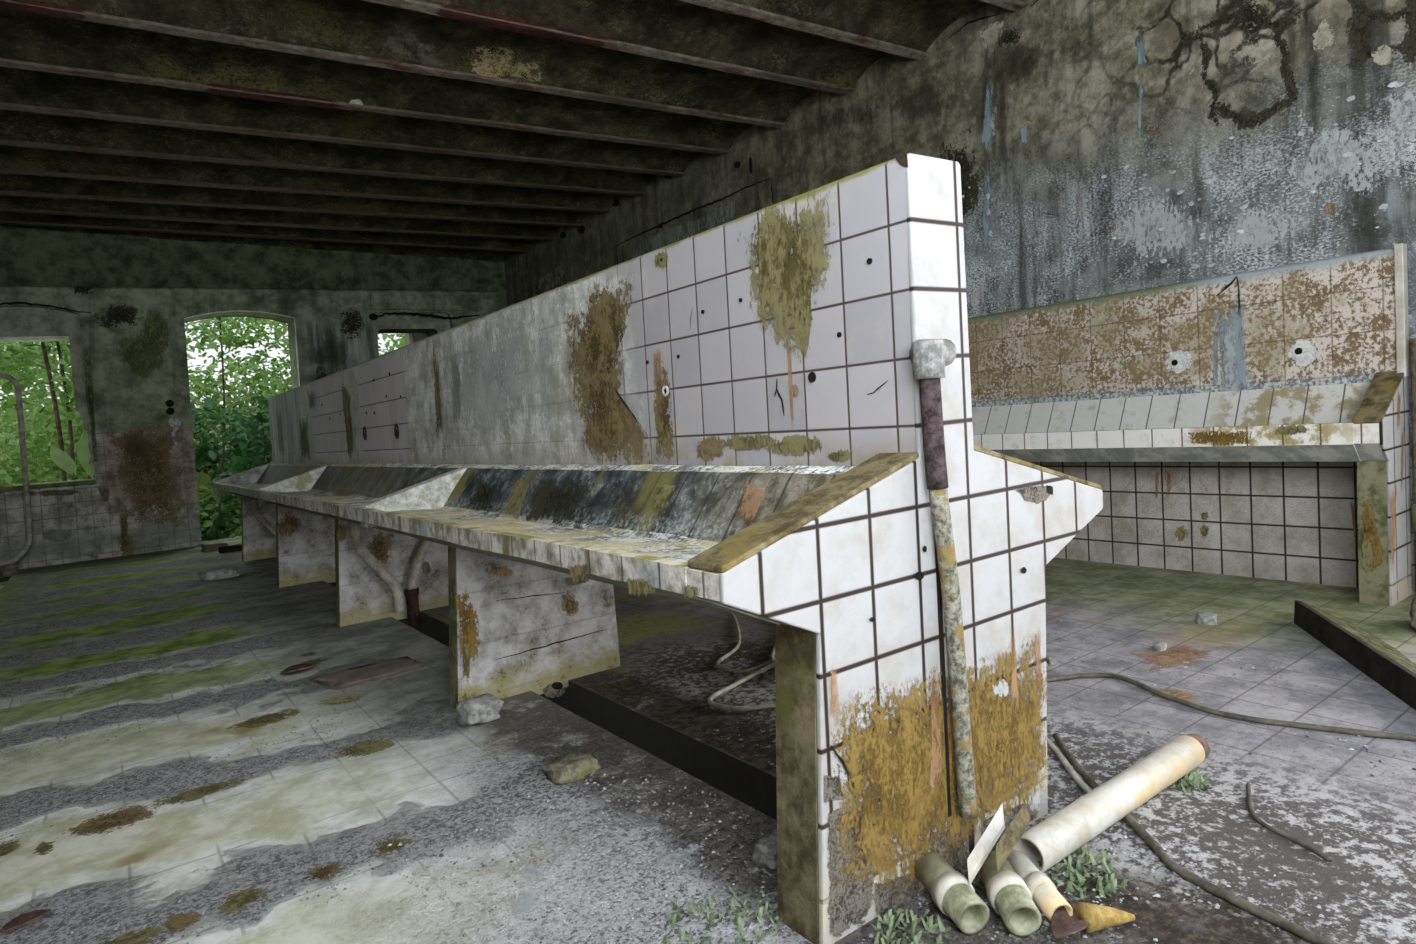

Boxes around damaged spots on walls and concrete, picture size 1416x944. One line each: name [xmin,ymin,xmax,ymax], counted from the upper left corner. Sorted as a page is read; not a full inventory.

crack [949,0,1038,38]
spalling [1237,38,1278,64]
spalling [1312,19,1334,53]
spalling [1371,45,1400,65]
damp [939,28,1040,252]
damp [798,245,813,344]
damp [84,354,180,556]
damp [0,486,78,496]
corrosion [831,670,839,716]
corrosion [930,684,942,788]